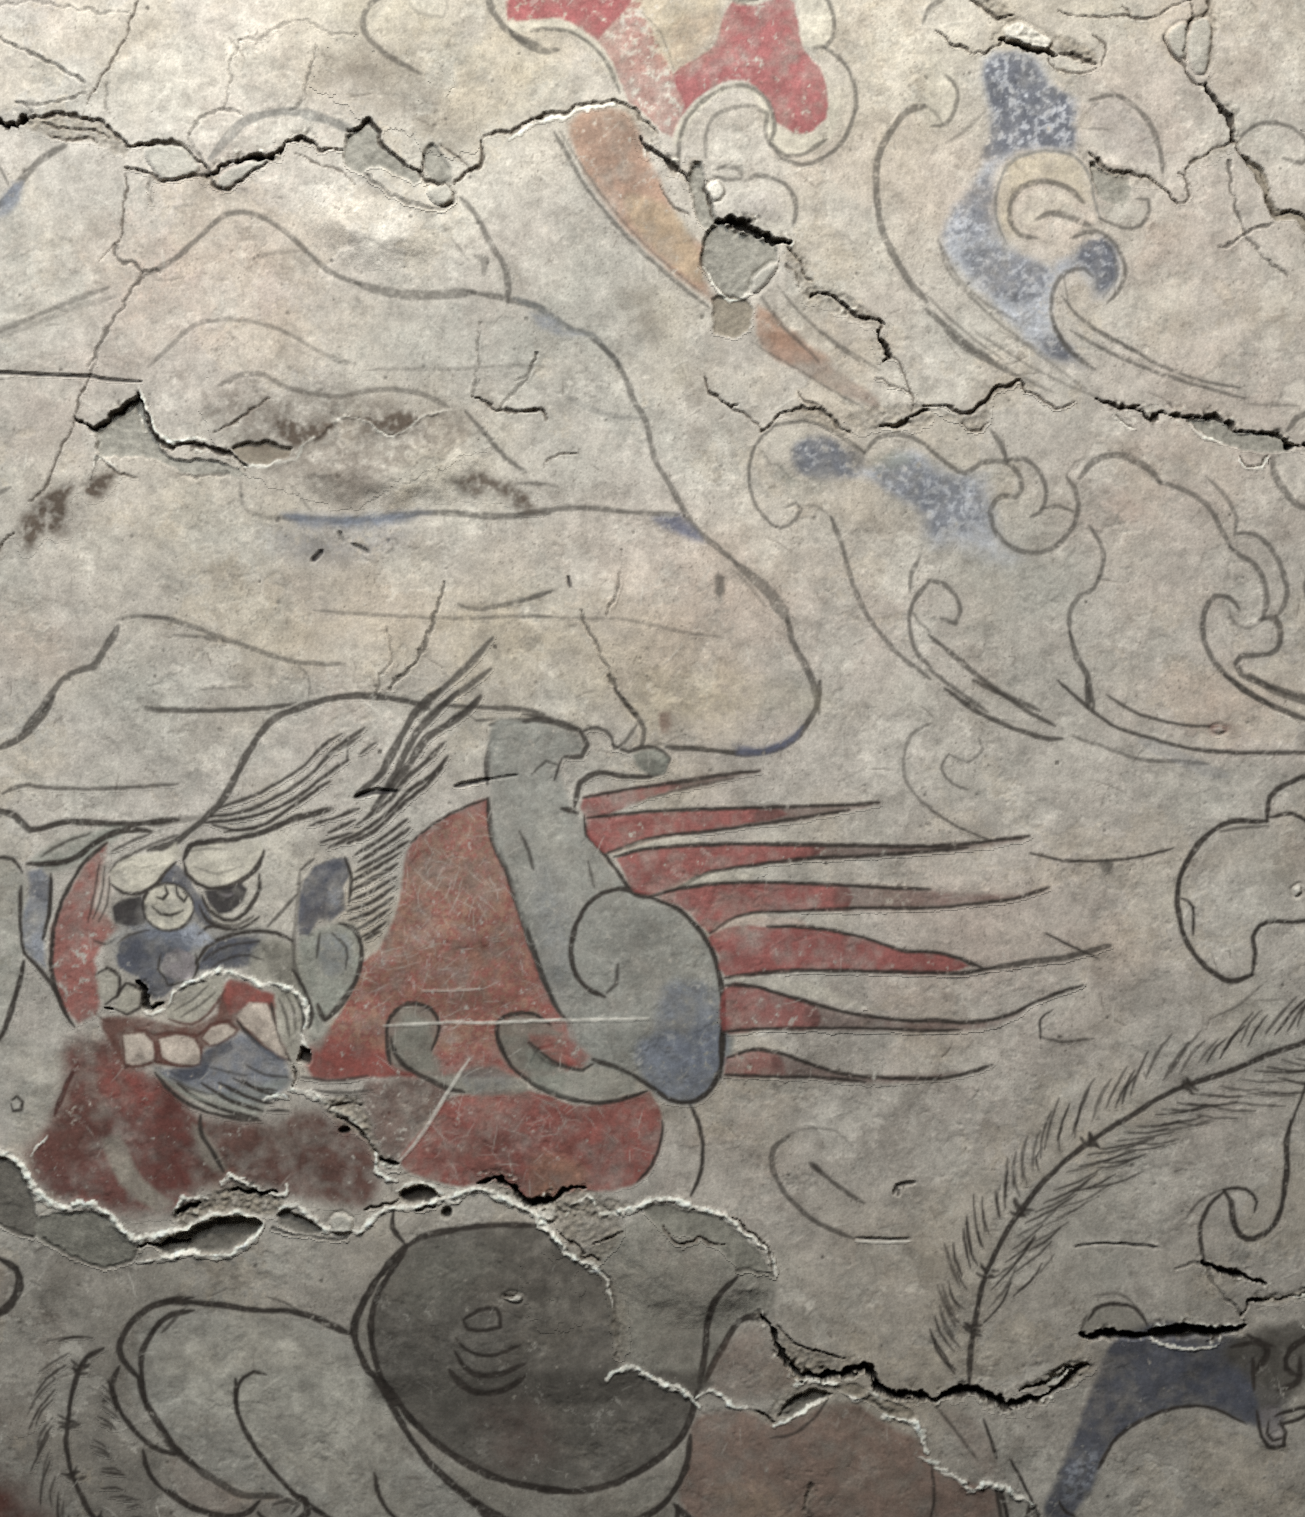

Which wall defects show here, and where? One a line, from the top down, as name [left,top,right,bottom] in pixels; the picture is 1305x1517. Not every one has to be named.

crack [0,0,357,547]
crack [471,98,1305,471]
crack [933,0,1305,278]
spalling [155,1170,290,1262]
crack [0,965,1097,1517]
spalling [1070,1313,1249,1352]
crack [1174,1255,1305,1329]